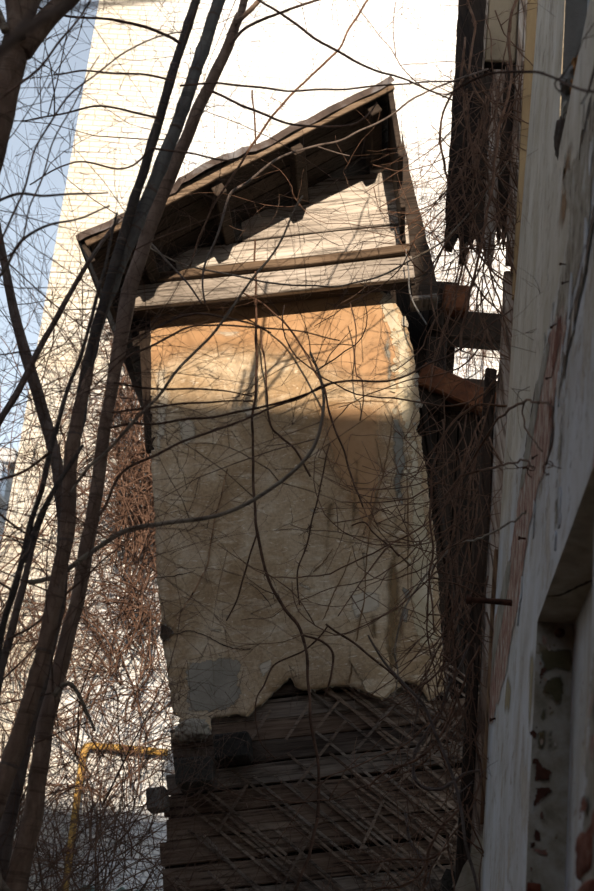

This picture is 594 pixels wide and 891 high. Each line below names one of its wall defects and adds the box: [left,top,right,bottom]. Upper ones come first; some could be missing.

spalling [488,65,594,724]
spalling [350,675,394,698]
spalling [532,758,552,819]
spalling [575,660,594,891]
spalling [525,867,541,891]